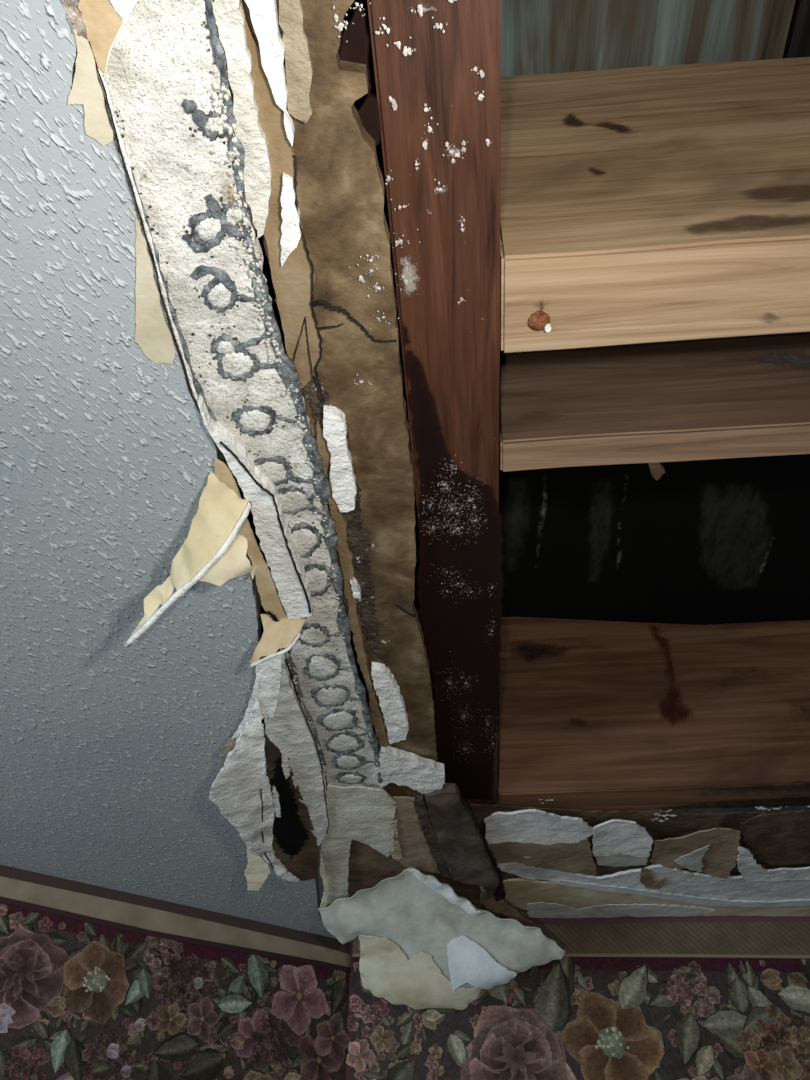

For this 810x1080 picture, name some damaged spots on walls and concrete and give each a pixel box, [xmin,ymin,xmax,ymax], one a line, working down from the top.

flaking render [62,0,445,794]
flaking render [484,809,595,845]
flaking render [497,857,810,907]